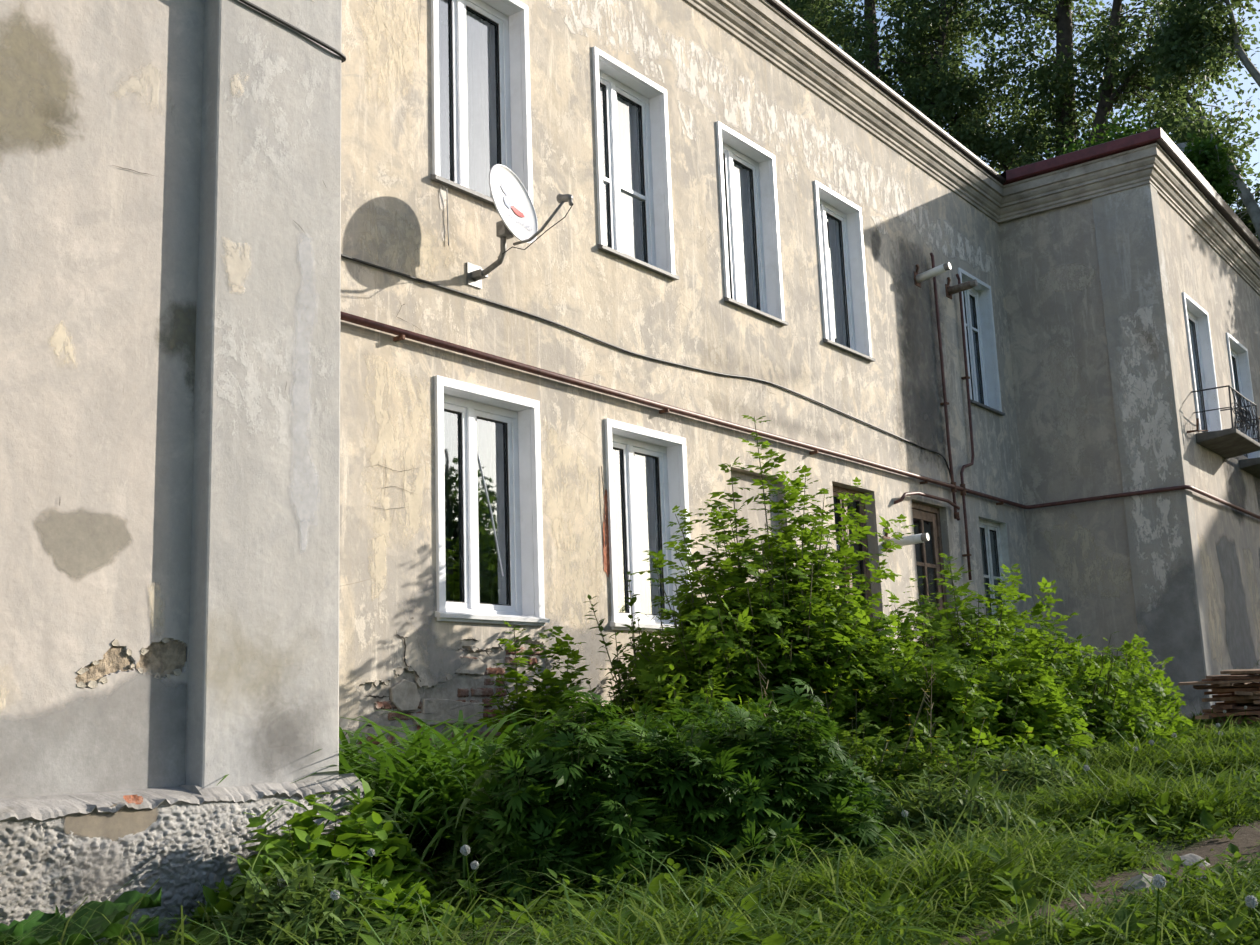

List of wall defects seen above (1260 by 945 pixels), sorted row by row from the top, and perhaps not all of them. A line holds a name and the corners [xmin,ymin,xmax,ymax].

water stain [0,15,73,146]
water stain [898,249,943,453]
peeling [1119,306,1183,612]
flaking render [75,585,186,689]
flaking render [357,641,553,753]
spalling [123,795,143,805]